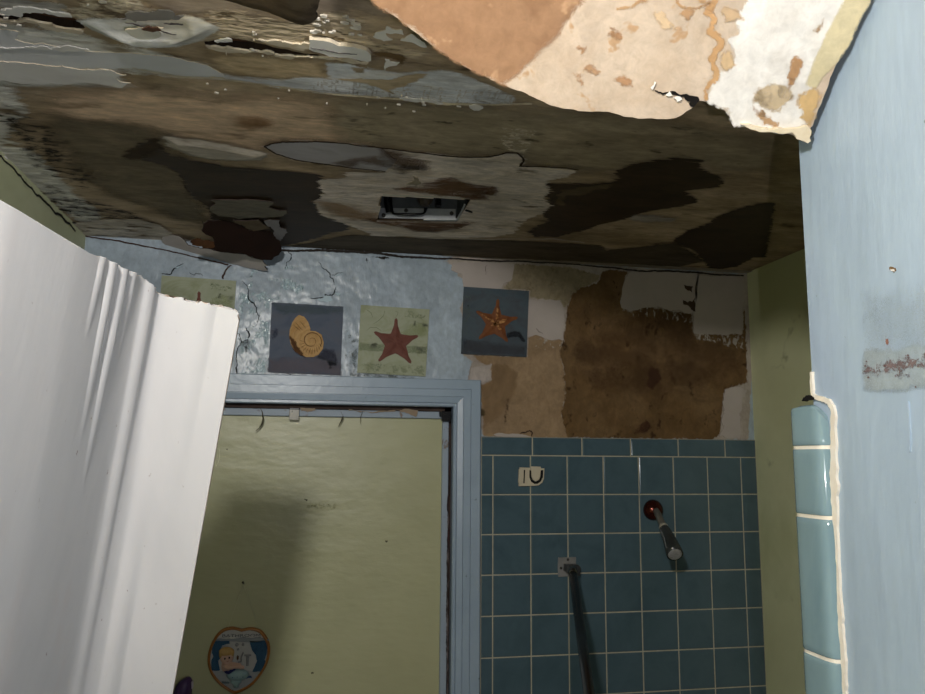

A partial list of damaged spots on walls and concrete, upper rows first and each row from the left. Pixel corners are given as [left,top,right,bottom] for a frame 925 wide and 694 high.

flaking render [60,0,157,20]
peeling [707,0,845,134]
peeling [0,7,585,271]
water stain [0,0,871,439]
crack [225,404,439,412]
peeling [442,255,752,440]
corrosion [862,352,925,379]